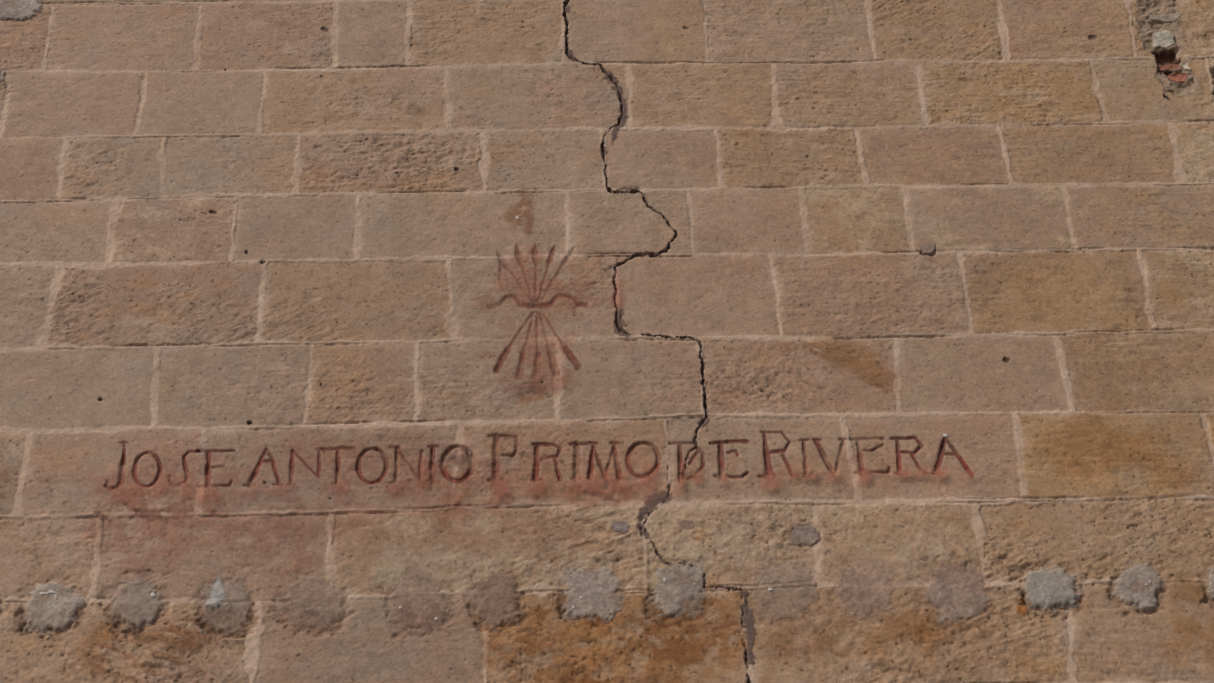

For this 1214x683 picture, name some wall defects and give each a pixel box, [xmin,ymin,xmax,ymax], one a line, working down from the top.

crack [563,0,756,683]
spalling [1137,0,1214,98]